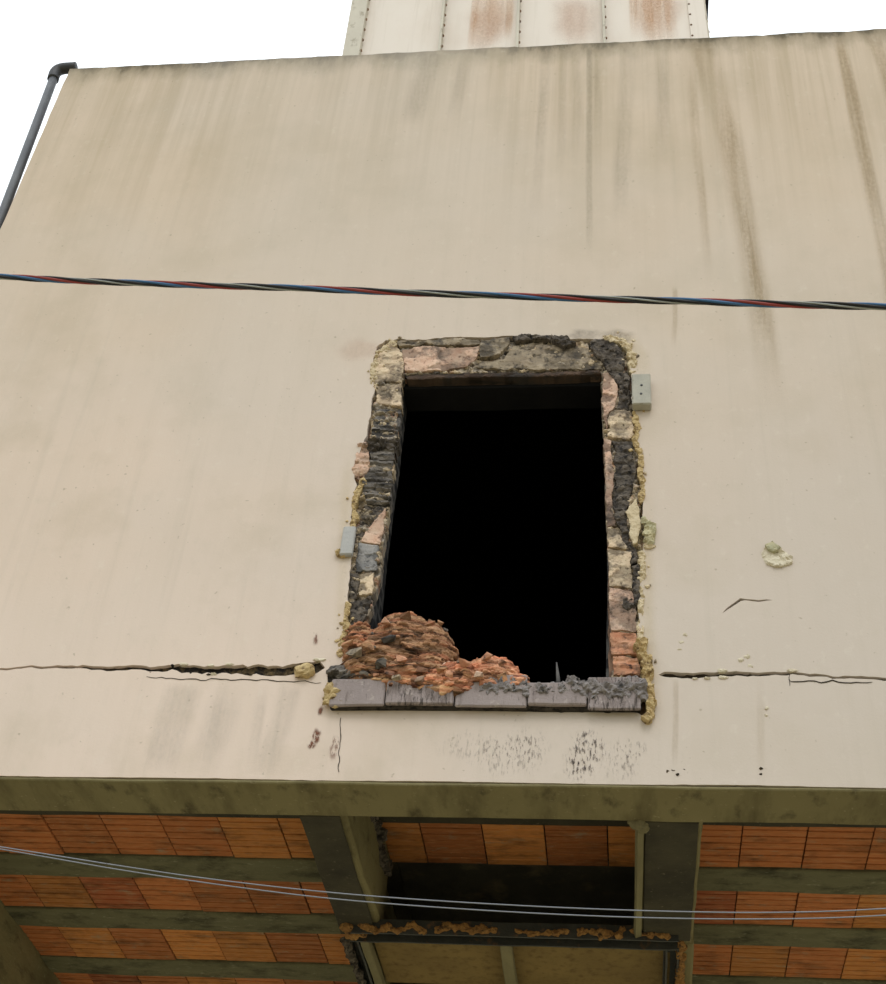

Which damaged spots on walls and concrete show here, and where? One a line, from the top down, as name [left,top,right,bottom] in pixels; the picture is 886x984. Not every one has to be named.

flaking render [334,331,657,678]
crack [38,658,326,684]
crack [662,668,886,686]